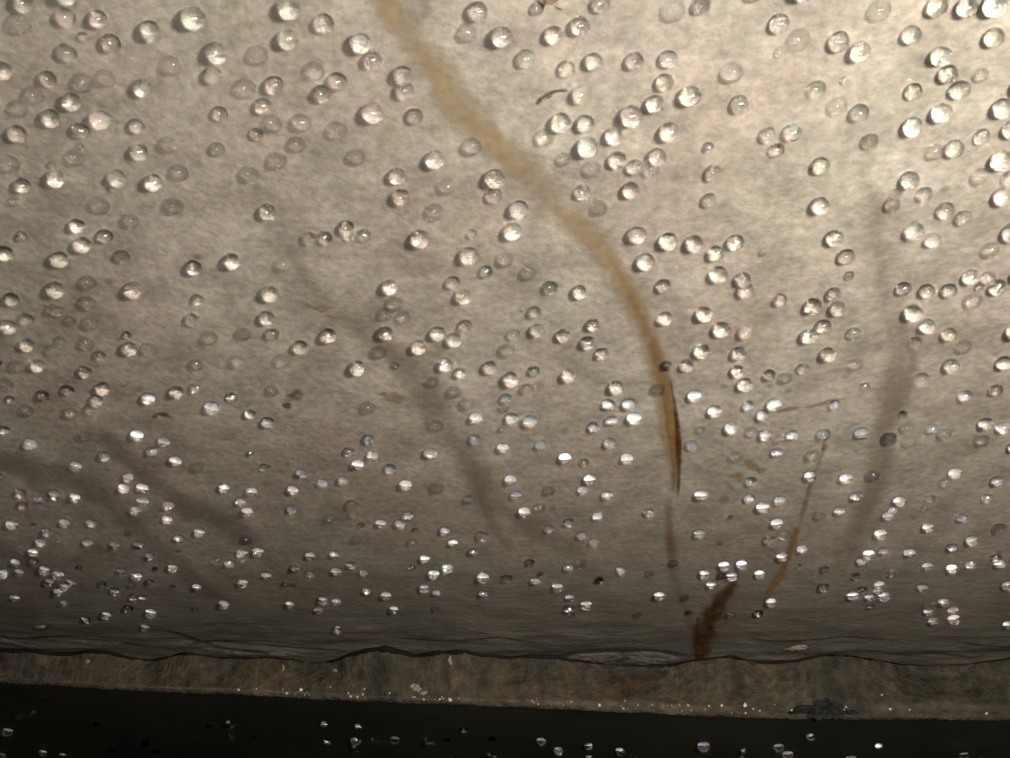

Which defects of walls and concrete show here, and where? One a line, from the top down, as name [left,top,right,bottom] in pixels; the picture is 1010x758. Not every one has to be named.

corrosion [564,214,681,491]
corrosion [764,529,798,600]
corrosion [695,581,736,660]